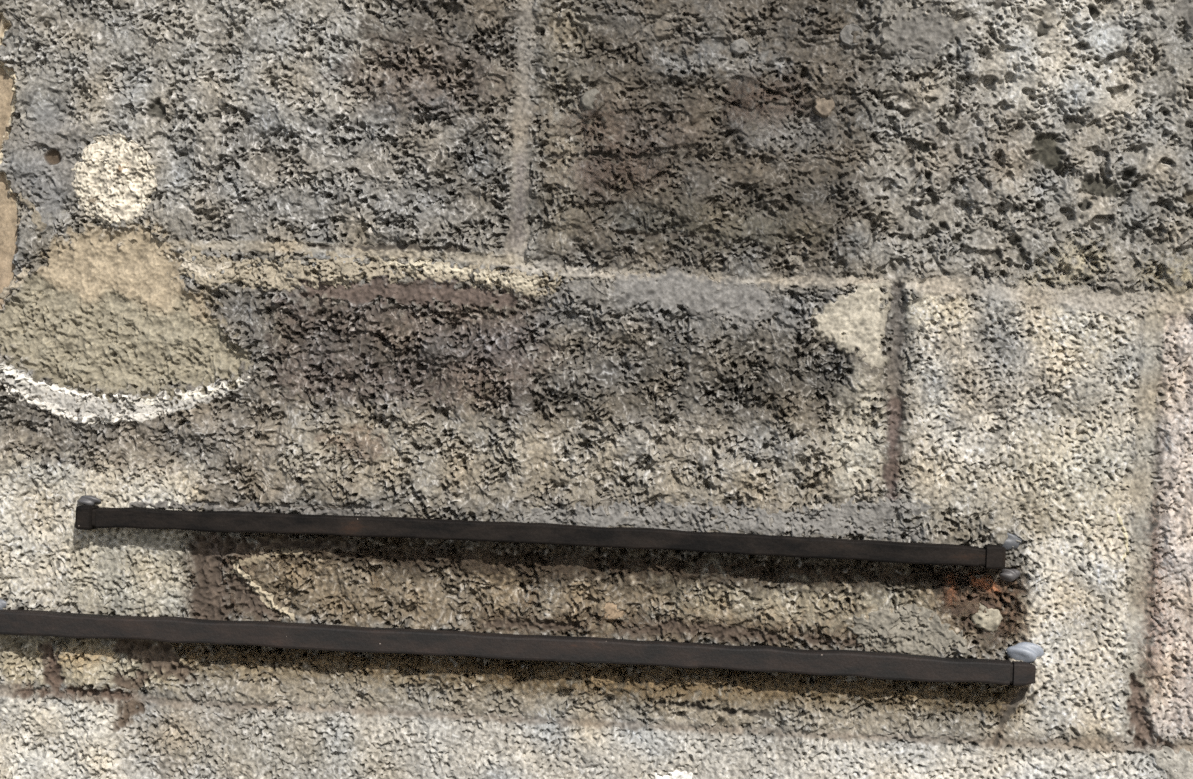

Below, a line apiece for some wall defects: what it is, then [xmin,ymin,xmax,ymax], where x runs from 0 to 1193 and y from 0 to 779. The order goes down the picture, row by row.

spalling [0,12,13,47]
spalling [0,61,255,407]
leakage [0,364,251,425]
corrosion [220,542,1018,635]